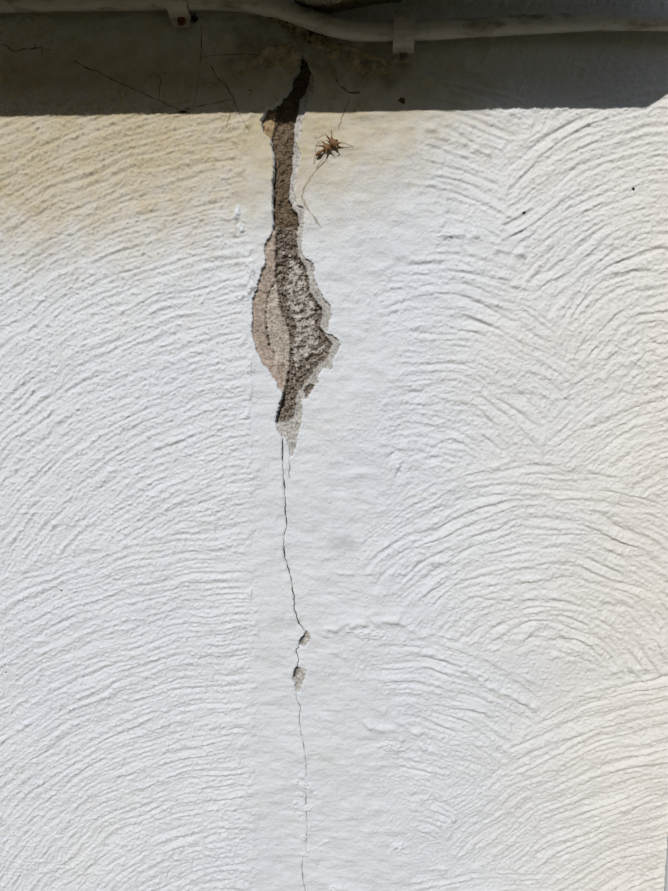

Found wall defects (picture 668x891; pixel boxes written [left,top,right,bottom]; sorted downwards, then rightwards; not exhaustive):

crack [72,26,327,247]
crack [336,79,361,129]
spalling [235,226,340,456]
crack [282,439,305,666]